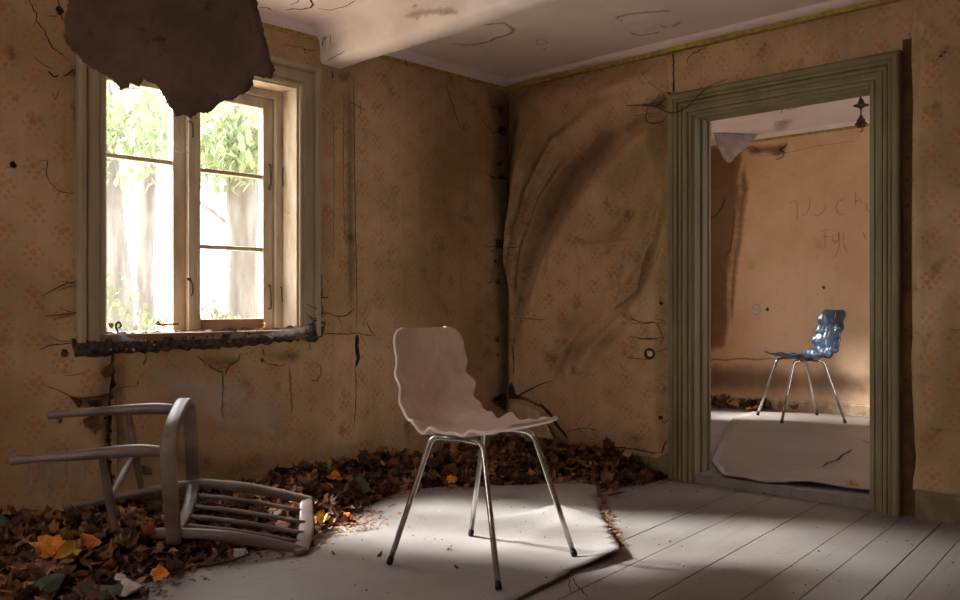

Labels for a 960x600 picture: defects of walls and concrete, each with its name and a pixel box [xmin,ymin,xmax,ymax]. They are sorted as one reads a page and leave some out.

crack [29,0,65,58]
water stain [711,149,739,346]
spalling [61,321,325,378]
crack [321,309,374,344]